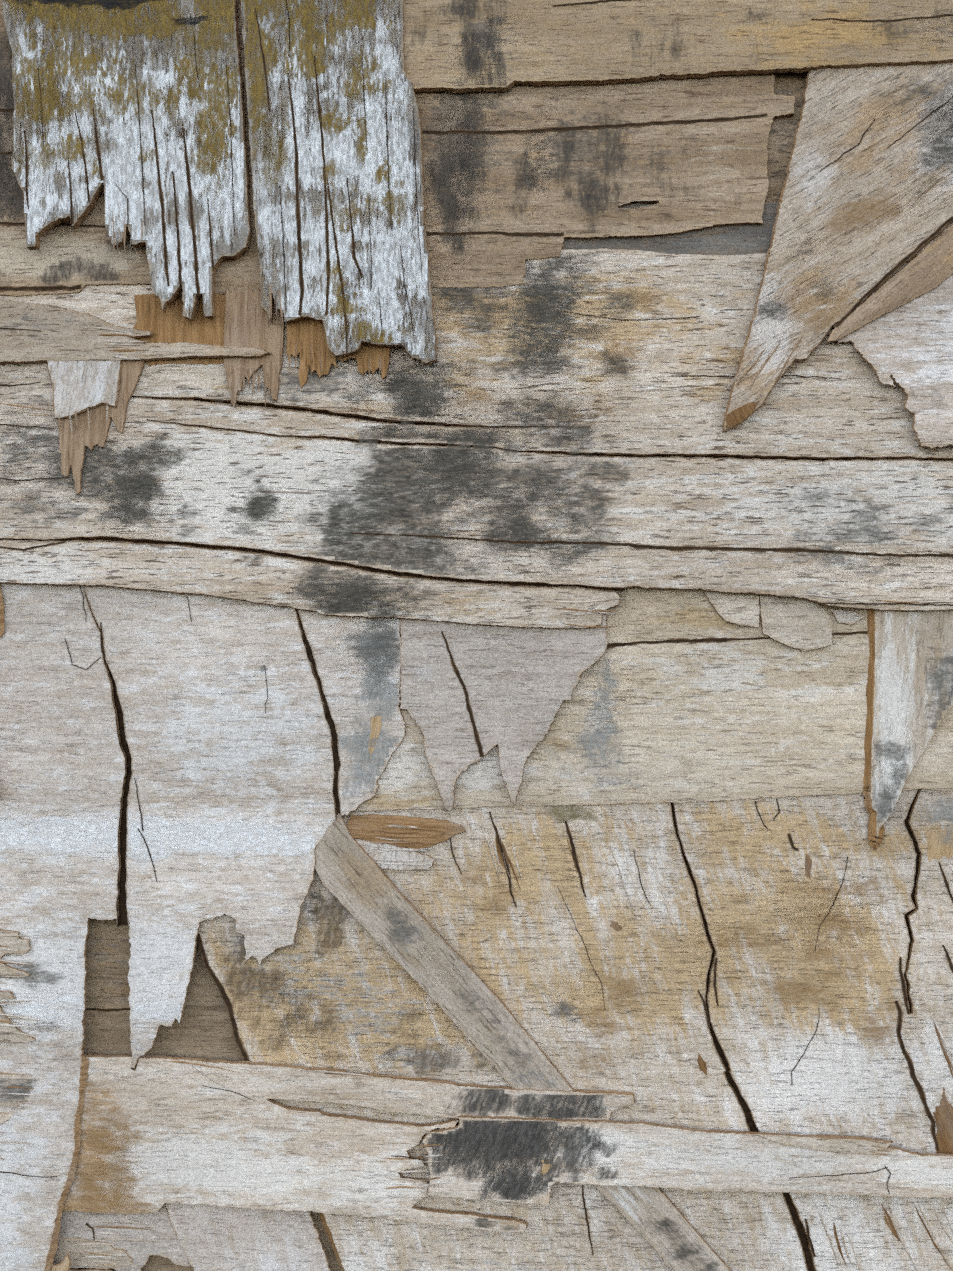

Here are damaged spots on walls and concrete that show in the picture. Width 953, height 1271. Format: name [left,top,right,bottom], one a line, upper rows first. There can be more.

peeling [10,18,435,358]
leakage [439,253,601,379]
leakage [0,428,182,524]
leakage [283,360,628,796]
crack [65,586,157,927]
peeling [0,816,318,863]
crack [294,609,341,819]
crack [669,802,760,1132]
crack [895,789,953,1150]
peeling [51,1252,71,1271]
leakage [427,1089,617,1201]
crack [781,1166,891,1271]